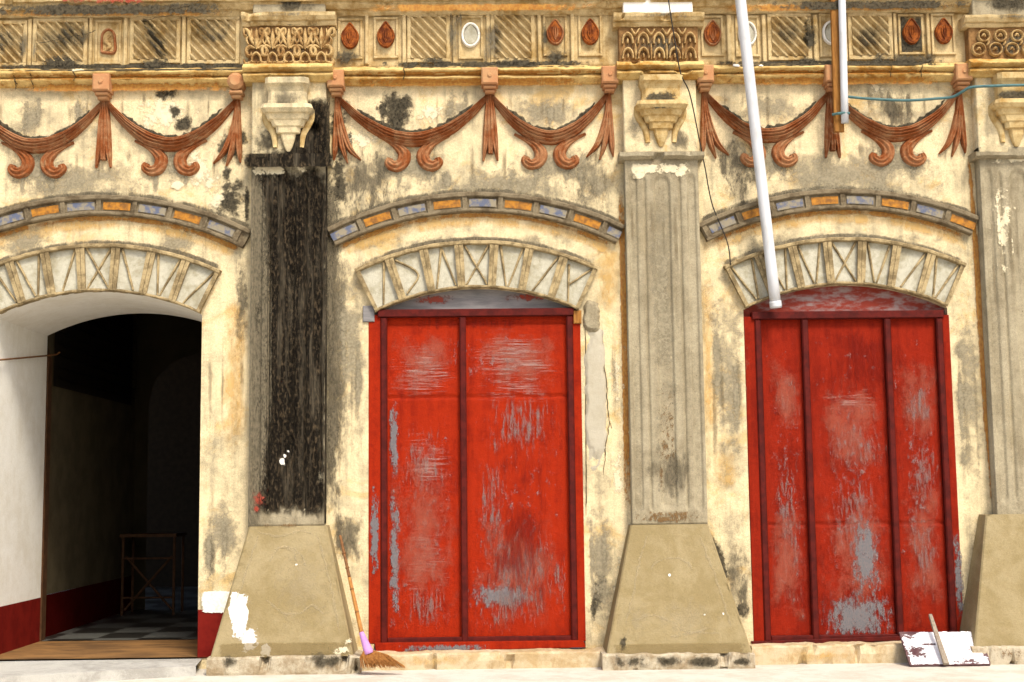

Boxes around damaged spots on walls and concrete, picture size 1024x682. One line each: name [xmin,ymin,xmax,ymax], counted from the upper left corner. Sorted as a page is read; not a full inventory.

flaking render [631,162,690,180]
flaking render [990,159,1024,272]
water stain [0,89,619,573]